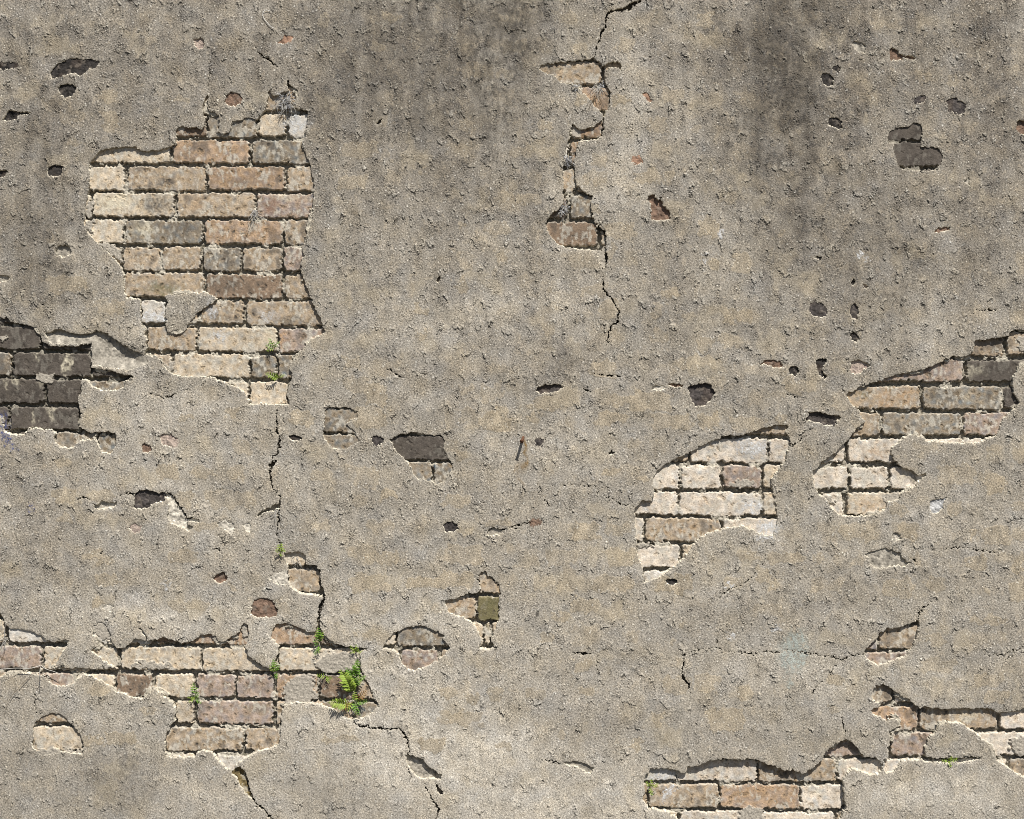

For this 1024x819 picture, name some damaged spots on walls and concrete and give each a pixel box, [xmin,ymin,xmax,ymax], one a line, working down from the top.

crack [594,0,642,57]
spalling [539,57,622,269]
spalling [0,83,325,454]
crack [597,223,620,345]
crack [268,410,282,548]
spalling [323,407,453,485]
spalling [634,424,792,586]
spalling [812,329,1024,517]
crack [317,596,325,617]
spalling [0,598,379,799]
crack [353,720,440,819]
spalling [642,683,1024,819]